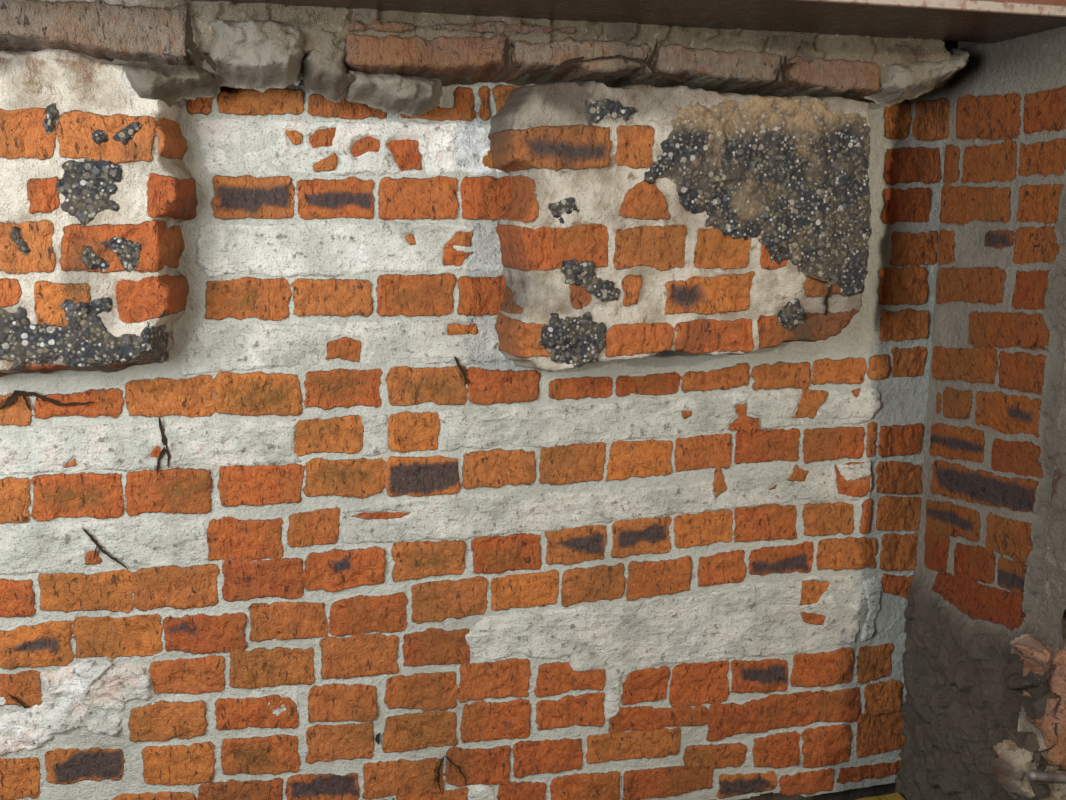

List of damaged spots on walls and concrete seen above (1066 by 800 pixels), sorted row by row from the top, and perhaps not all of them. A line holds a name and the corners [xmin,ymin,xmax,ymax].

crack [0,390,95,411]
crack [156,417,171,474]
crack [82,527,129,571]
spalling [0,657,157,755]
spalling [1026,770,1066,784]